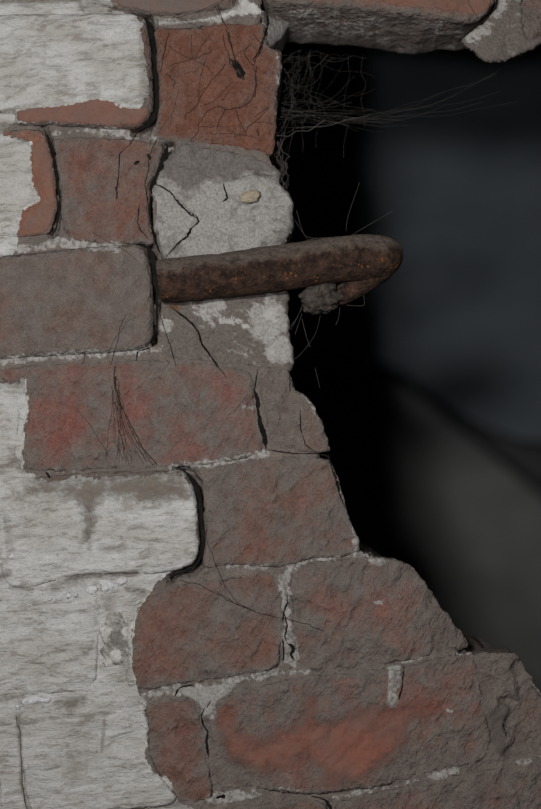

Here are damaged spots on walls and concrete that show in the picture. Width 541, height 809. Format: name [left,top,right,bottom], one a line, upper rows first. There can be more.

peeling [376,0,493,14]
peeling [17,98,149,126]
peeling [19,139,56,235]
crack [136,145,226,377]
rust [156,234,403,309]
crack [254,369,345,506]
peeling [130,587,153,691]
crack [282,596,295,661]